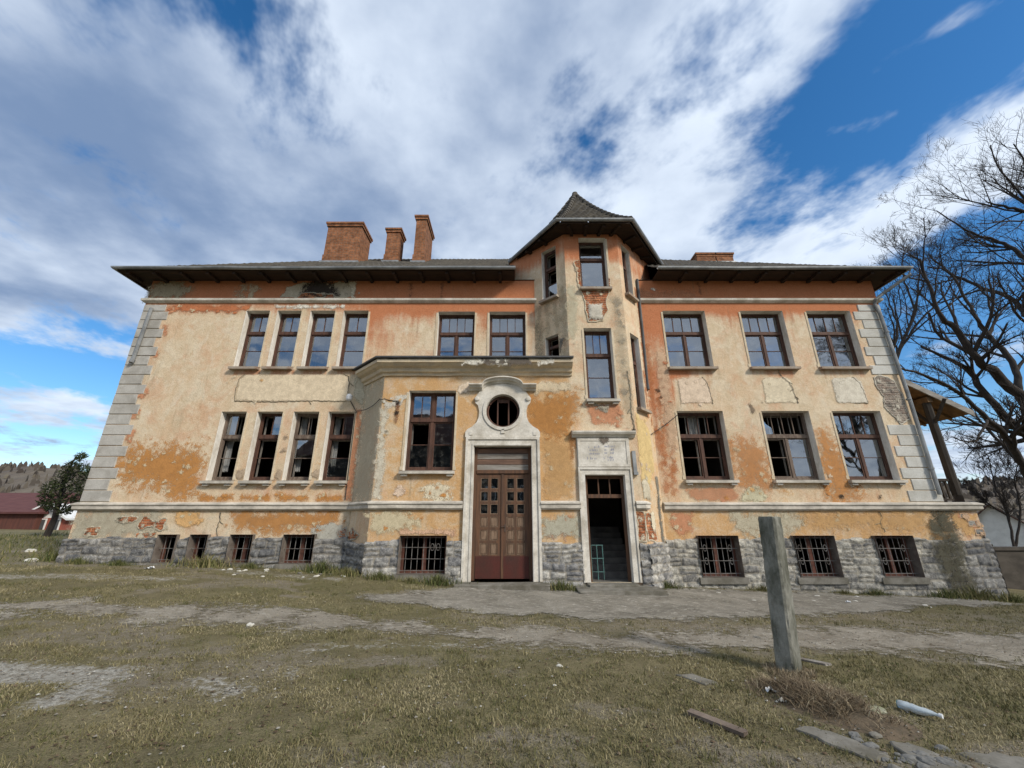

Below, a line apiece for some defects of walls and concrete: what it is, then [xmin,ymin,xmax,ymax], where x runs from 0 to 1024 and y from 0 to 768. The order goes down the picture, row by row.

flaking render [537,260,627,366]
peeling [101,389,457,542]
peeling [527,349,694,543]
flaking render [874,375,911,425]